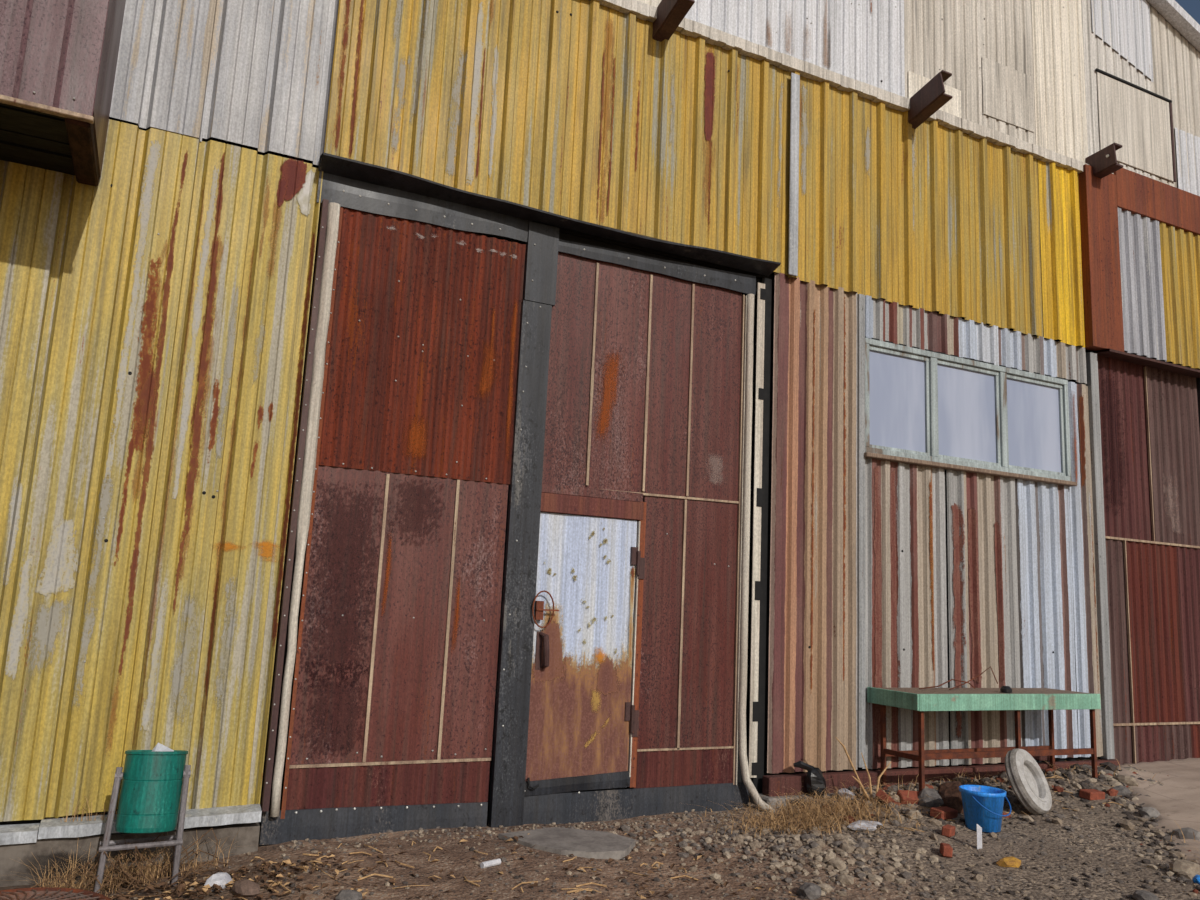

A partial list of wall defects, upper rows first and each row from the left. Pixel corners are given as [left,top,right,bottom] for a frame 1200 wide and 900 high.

corrosion [277,158,307,207]
corrosion [704,52,716,223]
peeling [3,140,161,705]
corrosion [114,150,188,675]
corrosion [173,152,225,612]
corrosion [480,311,495,396]
corrosion [507,303,517,437]
corrosion [598,355,619,435]
corrosion [1165,479,1180,532]
corrosion [205,571,219,696]
peeling [525,599,632,781]